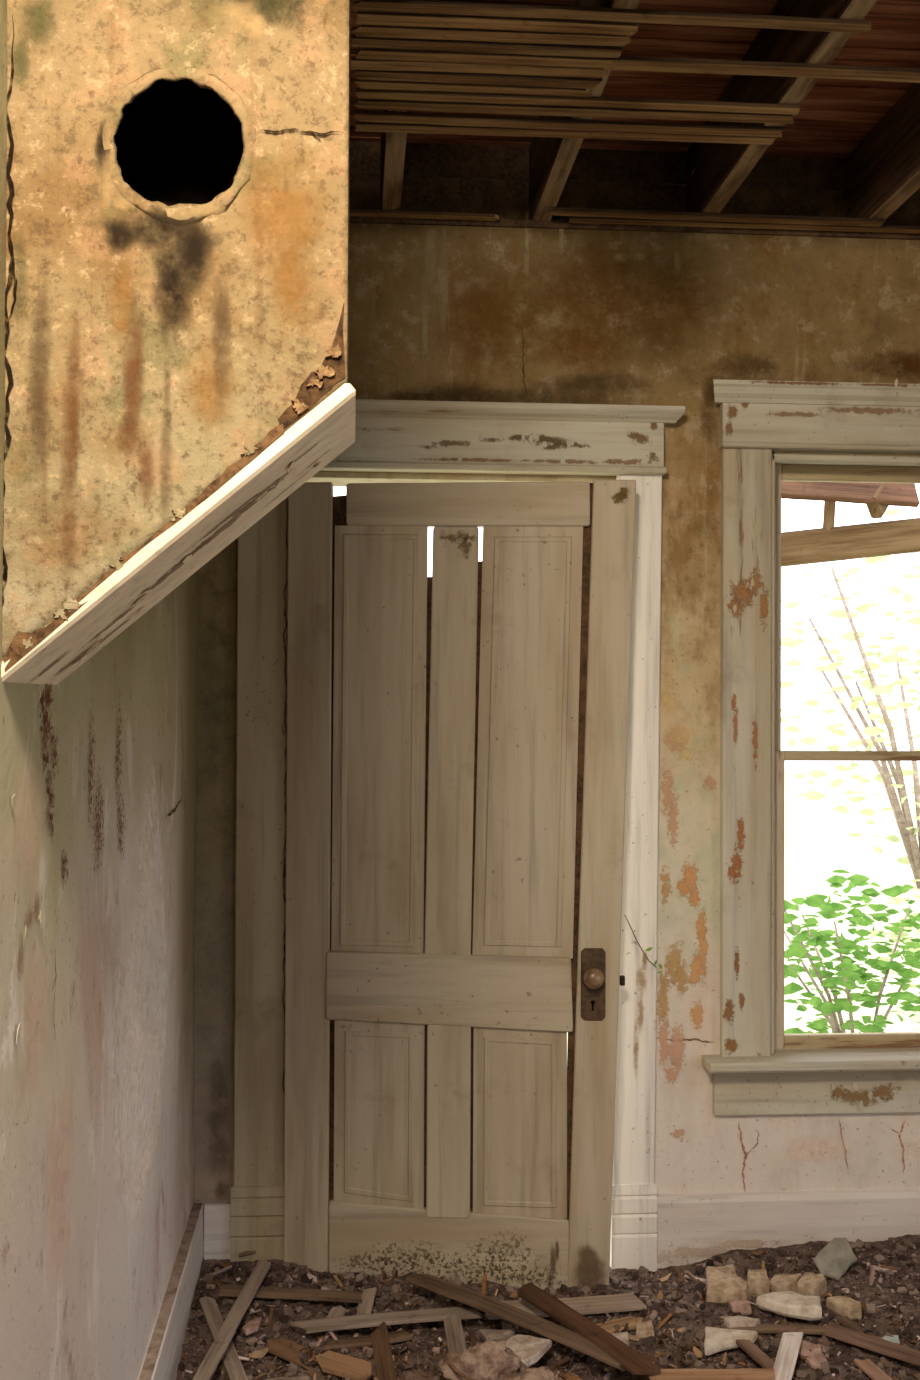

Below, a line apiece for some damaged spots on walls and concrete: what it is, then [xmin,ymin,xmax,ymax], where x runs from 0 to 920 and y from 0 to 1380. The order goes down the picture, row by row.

crack [261,128,342,140]
leakage [216,301,227,353]
leakage [32,321,45,434]
leakage [705,385,714,424]
peeling [769,407,920,418]
peeling [415,422,659,465]
peeling [725,569,768,624]
peeling [727,820,745,884]
peeling [657,862,709,1082]
peeling [723,947,746,1021]
peeling [831,1083,901,1112]
crack [738,1121,759,1193]